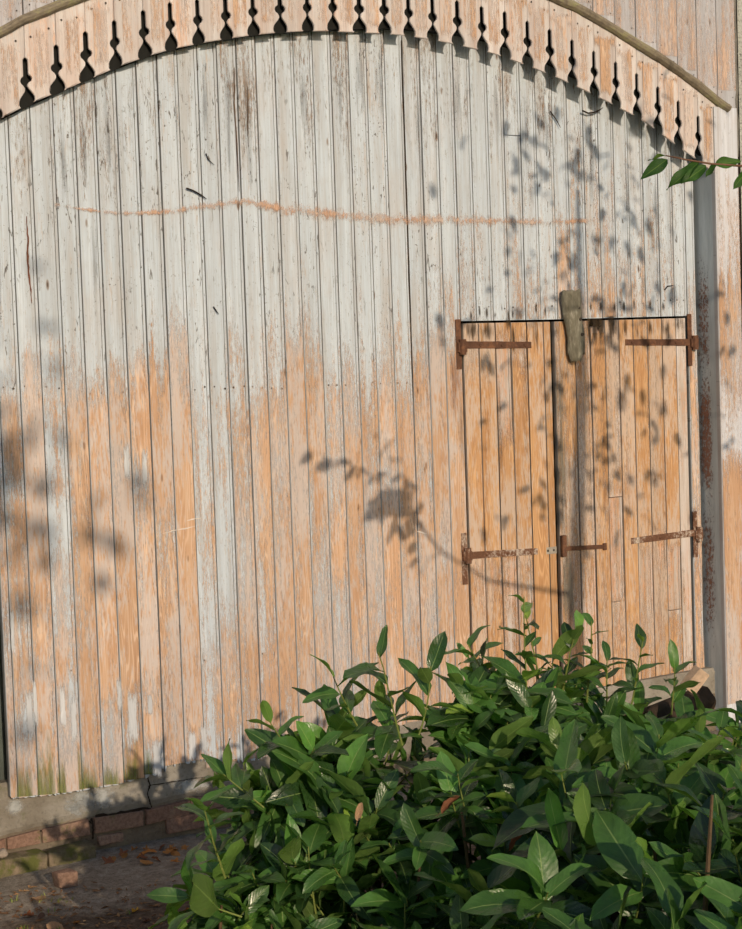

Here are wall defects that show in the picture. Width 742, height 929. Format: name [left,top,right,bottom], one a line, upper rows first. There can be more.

peeling [72,75,107,170]
peeling [220,0,273,136]
peeling [333,0,354,111]
peeling [366,0,384,58]
peeling [403,0,452,79]
peeling [512,0,616,136]
peeling [574,0,736,90]
peeling [622,49,713,160]
rust [698,262,709,368]
peeling [0,132,705,813]
rust [700,378,713,497]
rust [703,518,716,628]